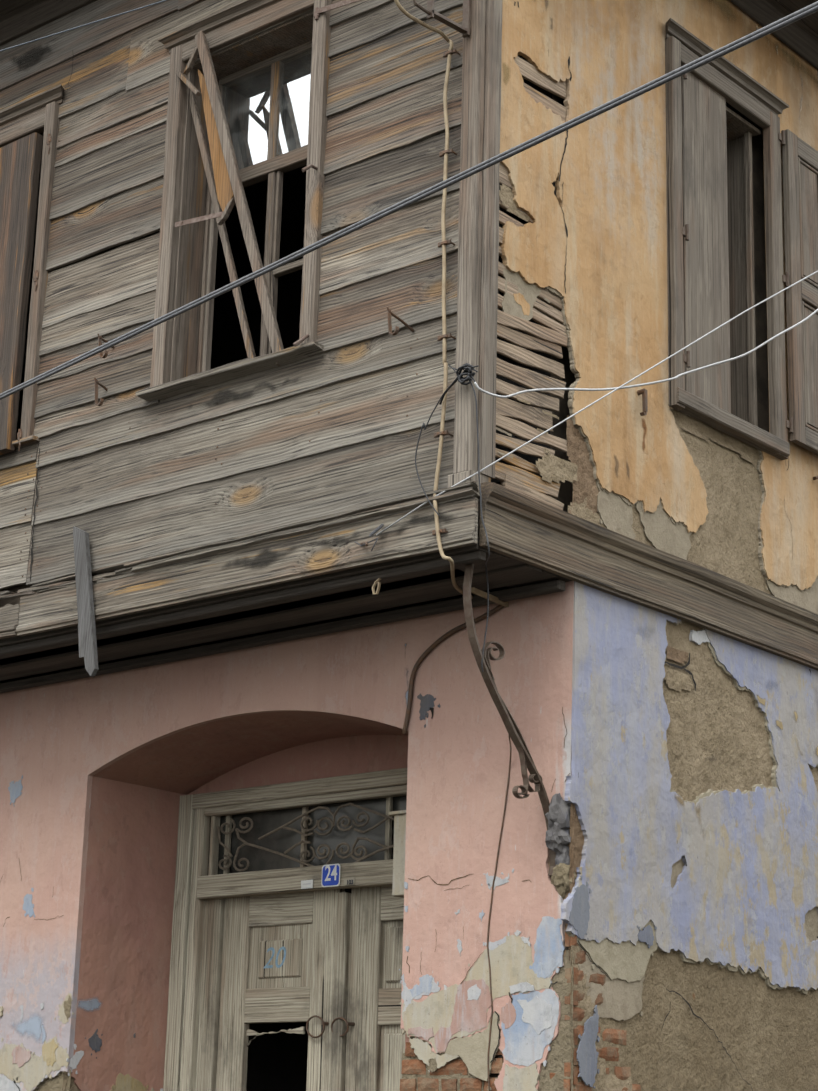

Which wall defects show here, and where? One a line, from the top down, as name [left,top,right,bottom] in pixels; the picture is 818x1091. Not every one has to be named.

crack [559,130,568,293]
flaking render [491,163,818,596]
flaking render [662,620,778,806]
flaking render [808,764,818,791]
peeling [22,888,35,917]
flaking render [399,793,818,1091]
peeling [0,993,103,1091]
crack [660,989,753,1091]